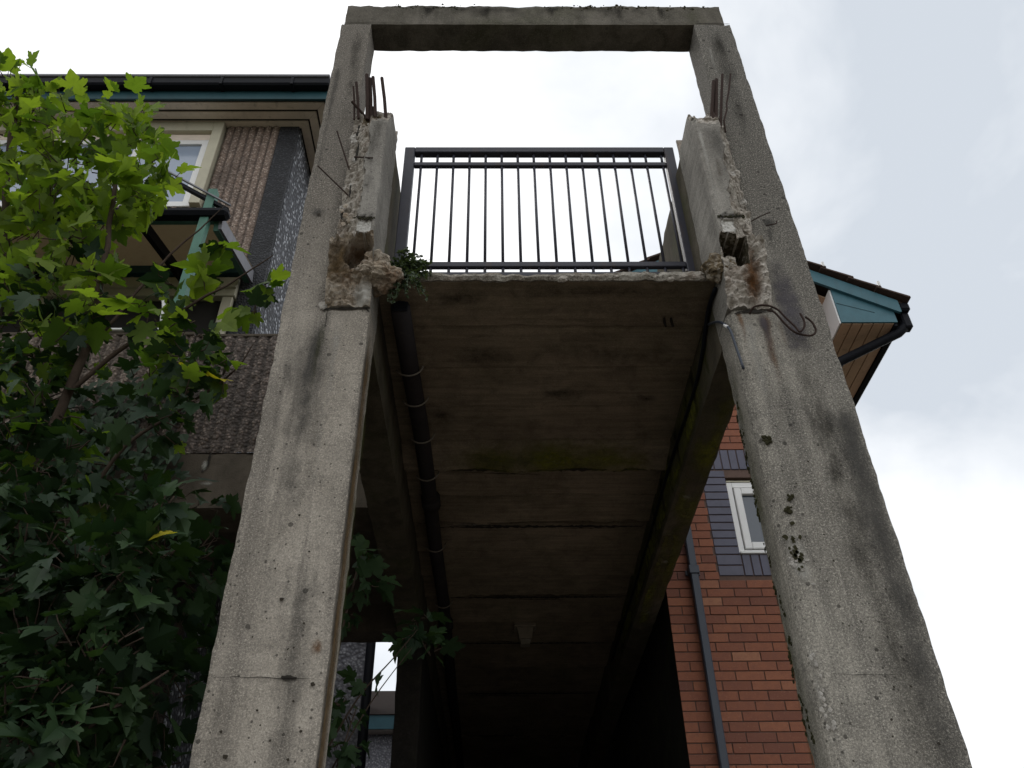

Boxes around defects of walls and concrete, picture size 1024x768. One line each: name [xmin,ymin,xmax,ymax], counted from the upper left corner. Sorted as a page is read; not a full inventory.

spalling [318,111,773,310]
spalling [782,521,809,573]
crack [225,673,308,681]